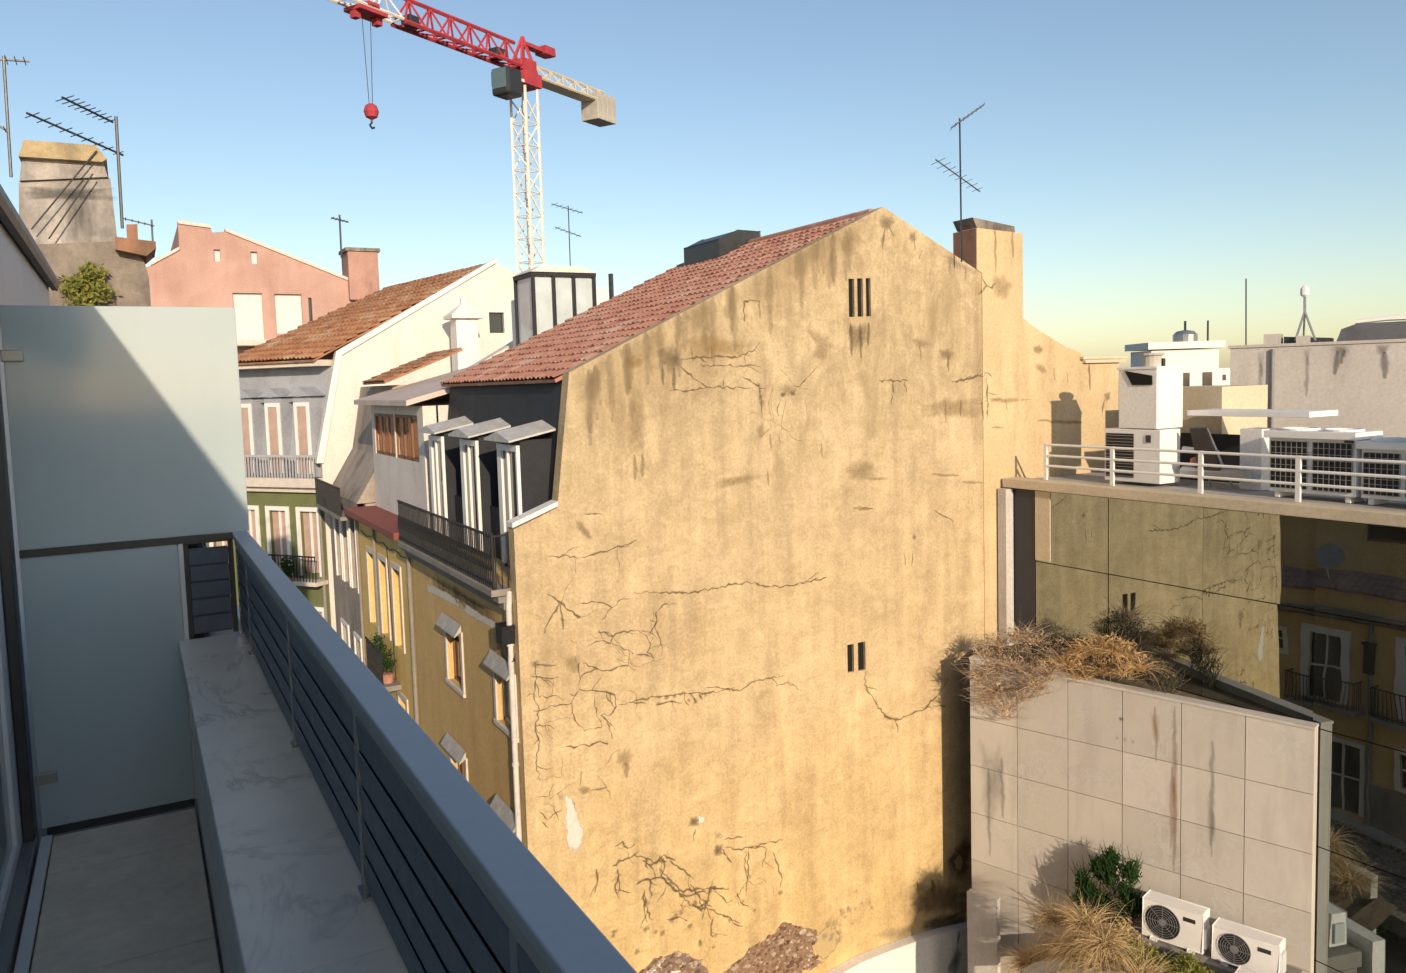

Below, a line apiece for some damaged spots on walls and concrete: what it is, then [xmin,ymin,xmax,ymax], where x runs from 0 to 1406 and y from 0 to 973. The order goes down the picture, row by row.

crack [670,300,816,416]
crack [529,540,826,827]
crack [864,674,948,733]
peeling [565,795,583,852]
crack [590,832,782,937]